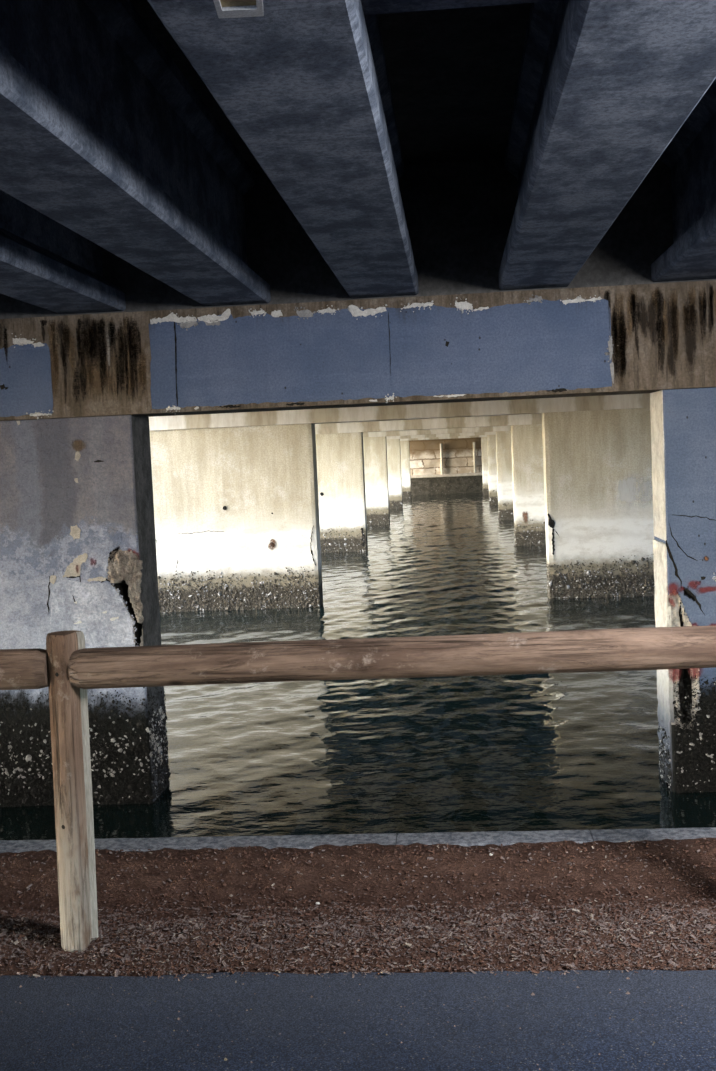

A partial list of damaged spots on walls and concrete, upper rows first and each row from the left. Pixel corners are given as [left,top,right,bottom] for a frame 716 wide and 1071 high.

peeling [150,309,231,330]
peeling [249,304,387,319]
peeling [400,300,434,312]
peeling [450,297,489,314]
peeling [560,295,602,305]
water stain [604,286,716,377]
water stain [40,317,146,403]
crack [548,513,559,555]
crack [666,515,716,615]
peeling [50,546,144,648]